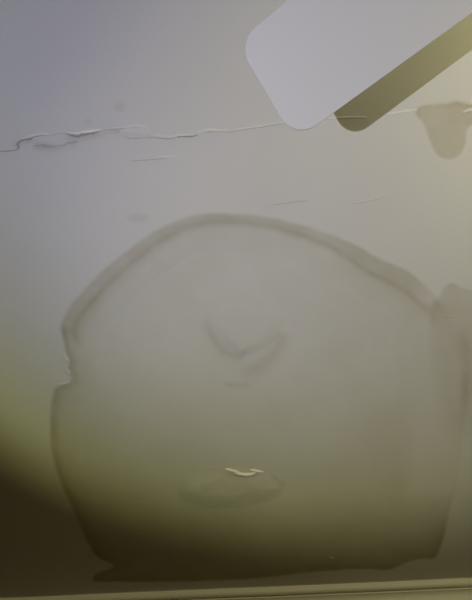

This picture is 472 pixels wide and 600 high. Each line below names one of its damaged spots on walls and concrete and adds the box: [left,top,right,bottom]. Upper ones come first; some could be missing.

crack [0,122,285,152]
peeling [226,468,263,478]